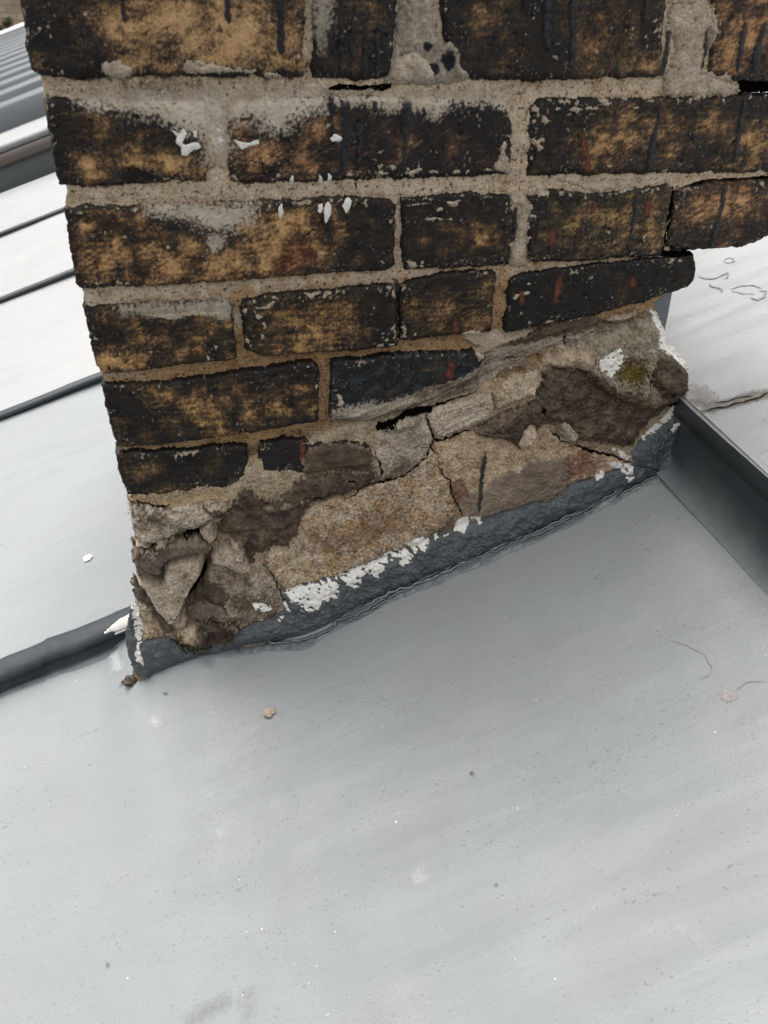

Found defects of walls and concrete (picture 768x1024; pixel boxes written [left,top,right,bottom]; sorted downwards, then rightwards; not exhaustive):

crack [314,391,476,515]
peeling [597,348,624,378]
peeling [641,405,680,440]
spalling [183,519,241,644]
crack [259,430,659,644]